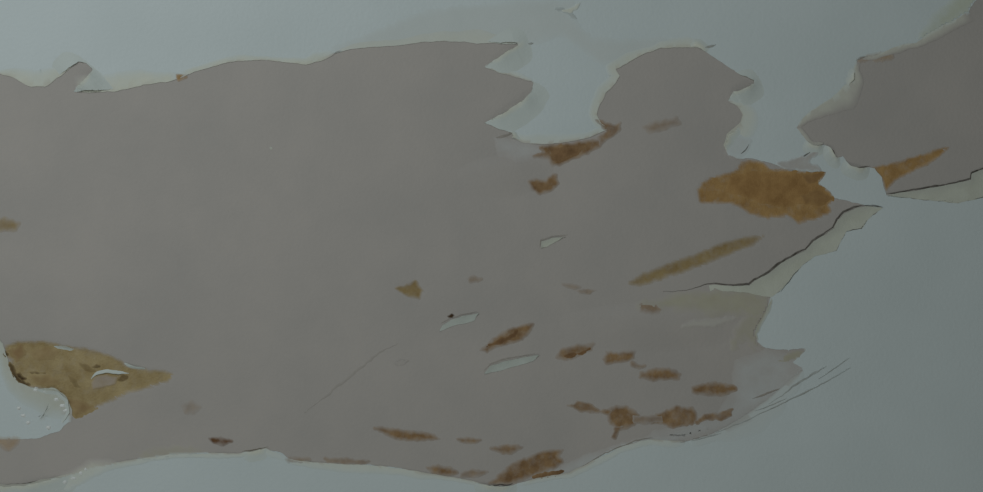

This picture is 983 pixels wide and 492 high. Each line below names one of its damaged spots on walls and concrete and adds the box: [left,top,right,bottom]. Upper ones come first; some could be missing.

peeling [179,0,668,78]
peeling [696,0,983,225]
peeling [0,39,864,486]
crack [688,359,851,441]
peeling [0,473,76,492]
peeling [58,458,119,491]